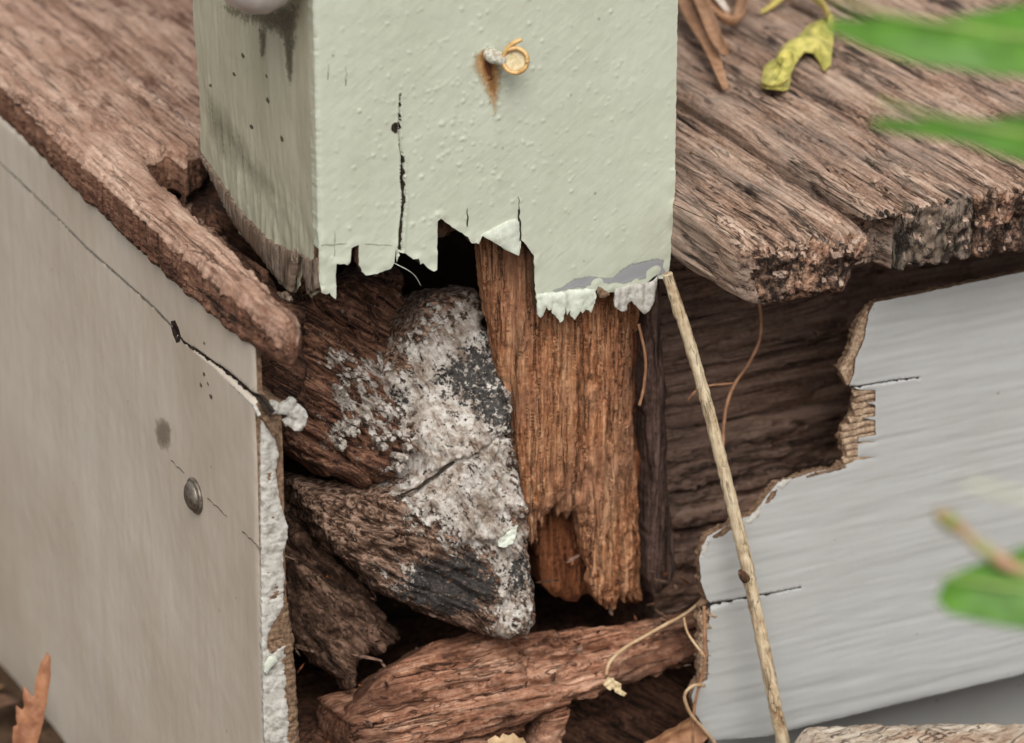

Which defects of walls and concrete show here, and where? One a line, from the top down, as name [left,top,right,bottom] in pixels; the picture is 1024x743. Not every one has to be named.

rust [475,51,500,107]
crack [391,94,406,250]
peeling [474,219,519,256]
crack [0,162,275,417]
peeling [535,277,658,323]
spalling [807,305,875,478]
crack [848,377,919,388]
peeling [745,478,792,524]
peeling [700,525,731,558]
crack [700,587,801,610]